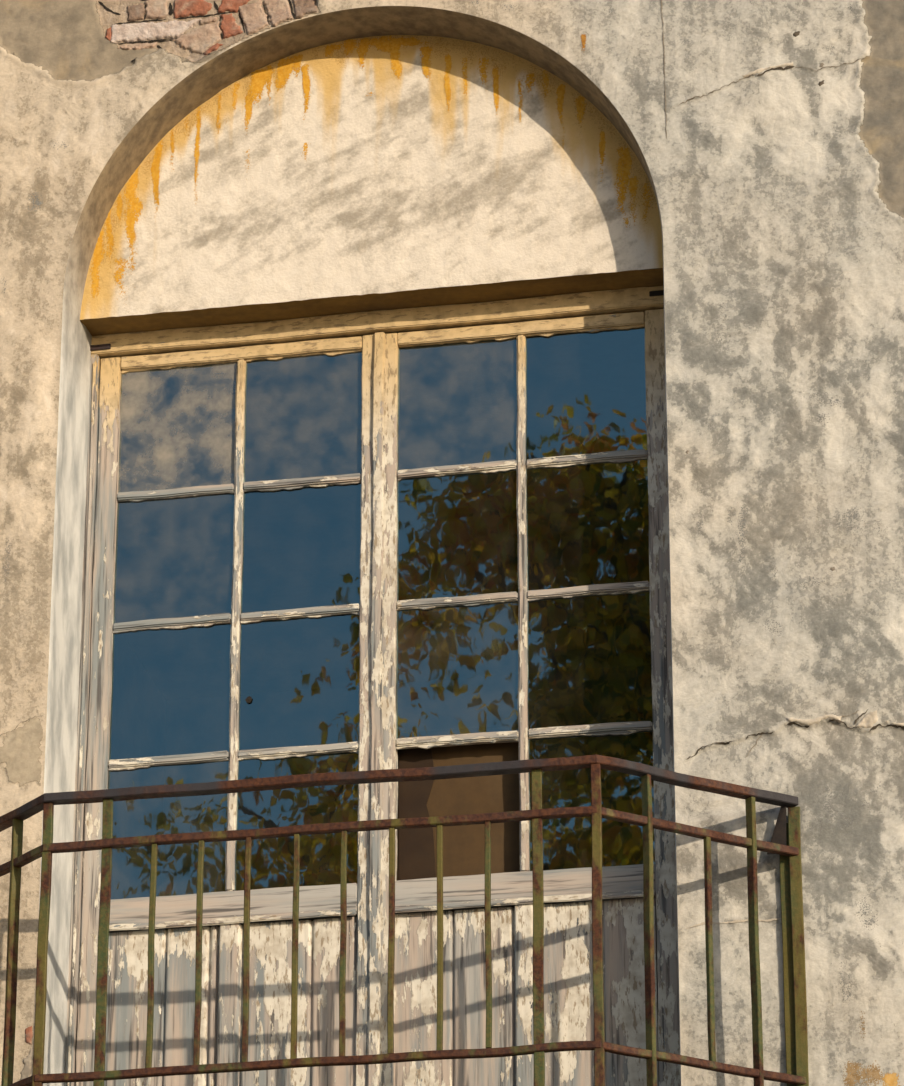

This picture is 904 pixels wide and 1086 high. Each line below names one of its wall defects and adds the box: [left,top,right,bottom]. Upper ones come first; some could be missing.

flaking render [0,0,321,81]
damp [88,35,658,308]
crack [661,0,859,138]
peeling [859,0,904,218]
peeling [0,716,43,787]
crack [687,710,904,759]